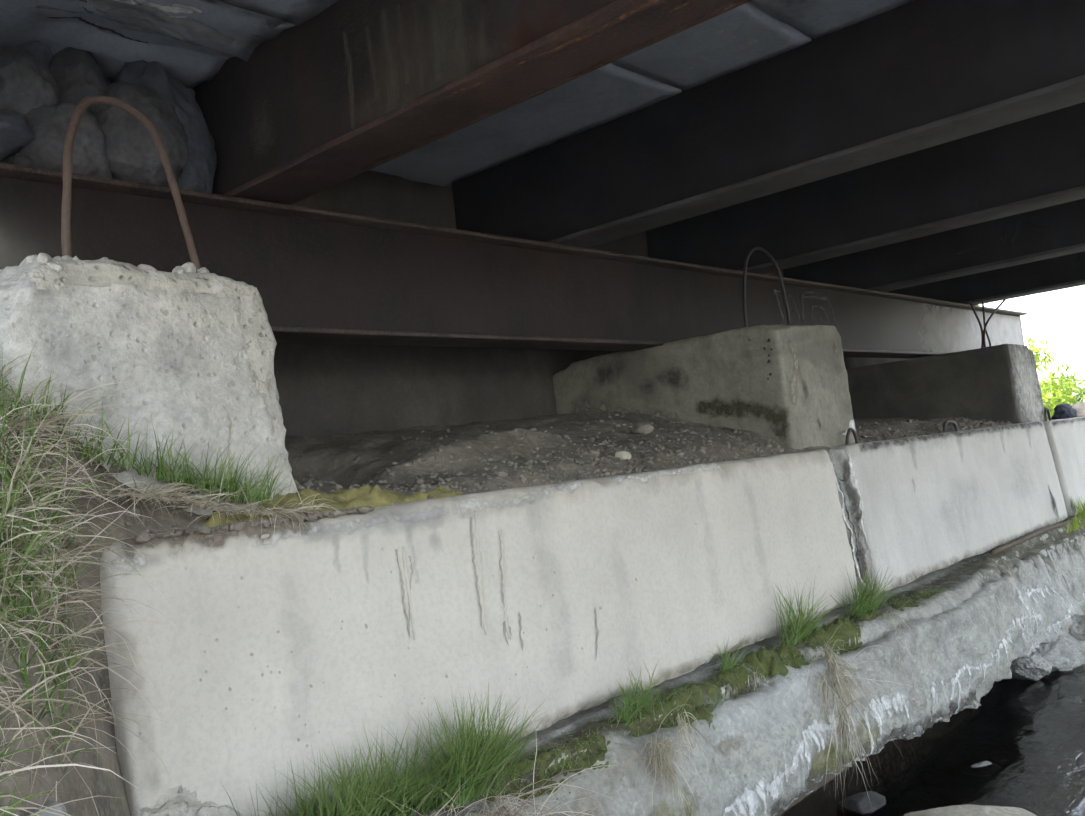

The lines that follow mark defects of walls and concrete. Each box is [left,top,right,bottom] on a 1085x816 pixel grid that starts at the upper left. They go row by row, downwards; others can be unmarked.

water stain [862,417,1085,449]
crack [396,546,416,640]
crack [470,514,523,651]
crack [592,608,600,658]
water stain [834,453,870,590]
water stain [723,585,1085,816]